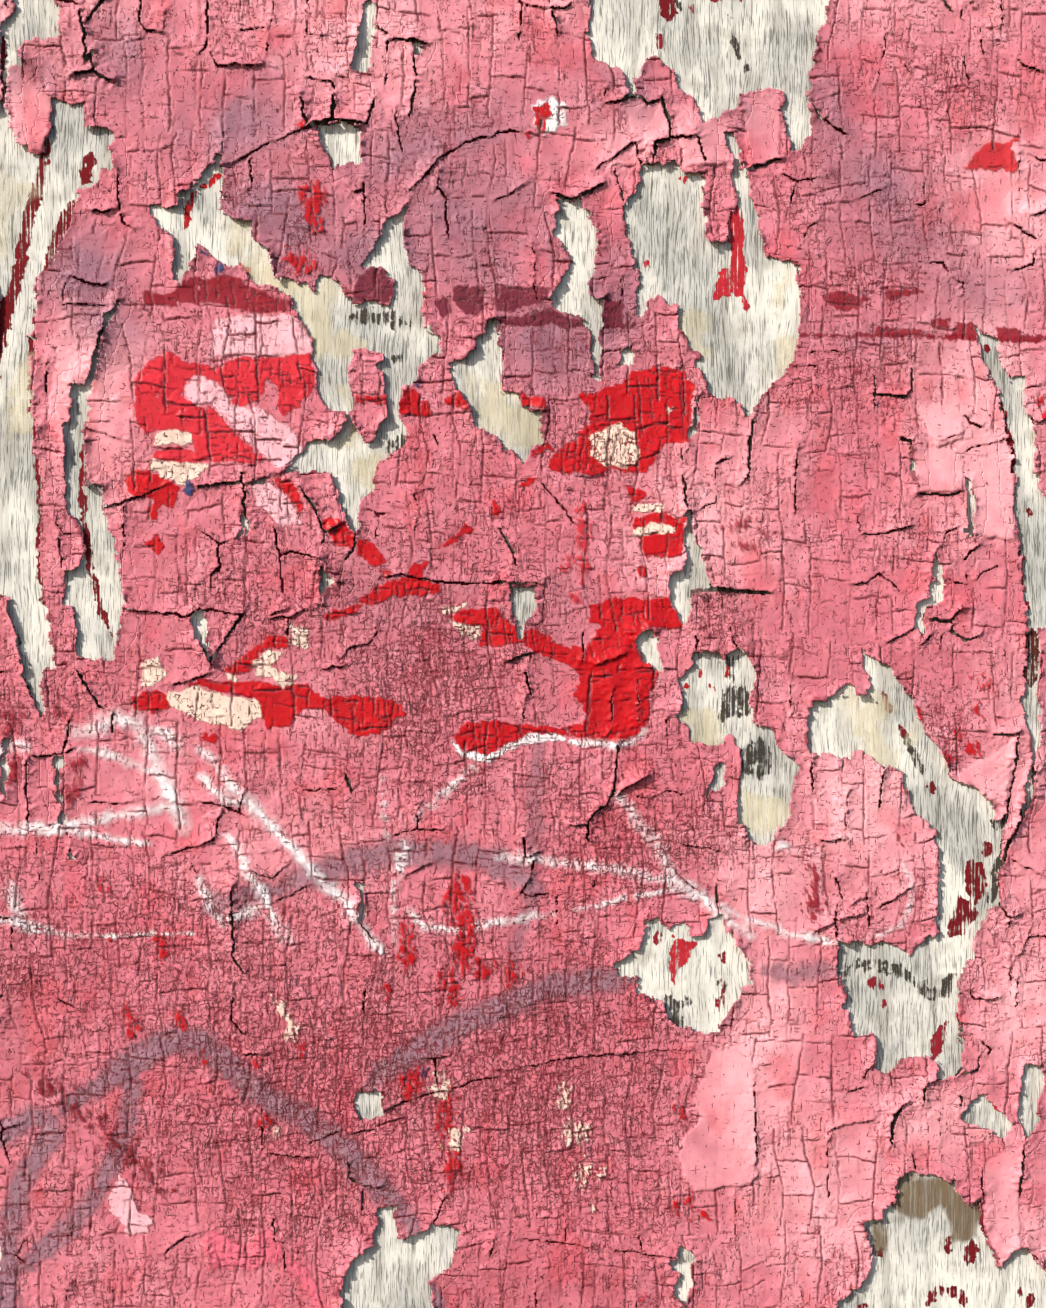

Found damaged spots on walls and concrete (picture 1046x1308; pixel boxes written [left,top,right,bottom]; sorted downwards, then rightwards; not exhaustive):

peeling [0,0,141,815]
crack [54,0,111,83]
peeling [150,132,556,554]
crack [219,28,520,237]
crack [553,89,707,205]
peeling [537,0,839,469]
crack [0,613,115,880]
peeling [601,902,764,1045]
peeling [632,312,1046,1154]
crack [888,527,1006,676]
crack [970,731,1046,1007]
peeling [822,1160,1046,1308]